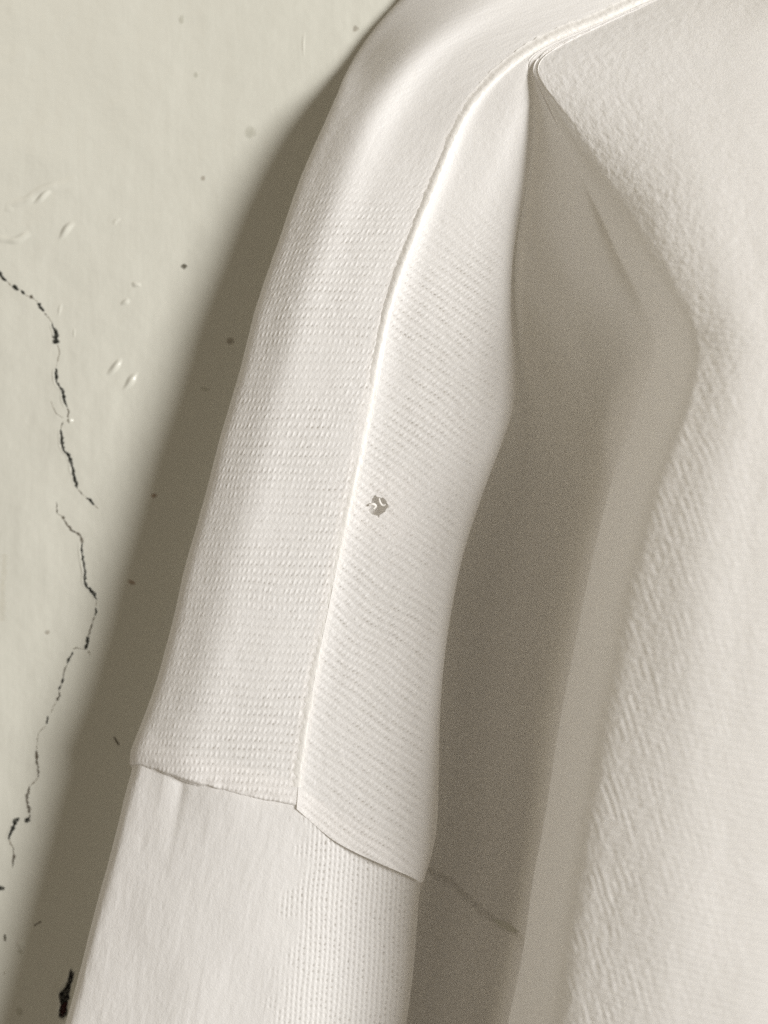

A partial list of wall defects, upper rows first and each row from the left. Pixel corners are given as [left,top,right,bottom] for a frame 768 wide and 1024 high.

crack [0,272,97,867]